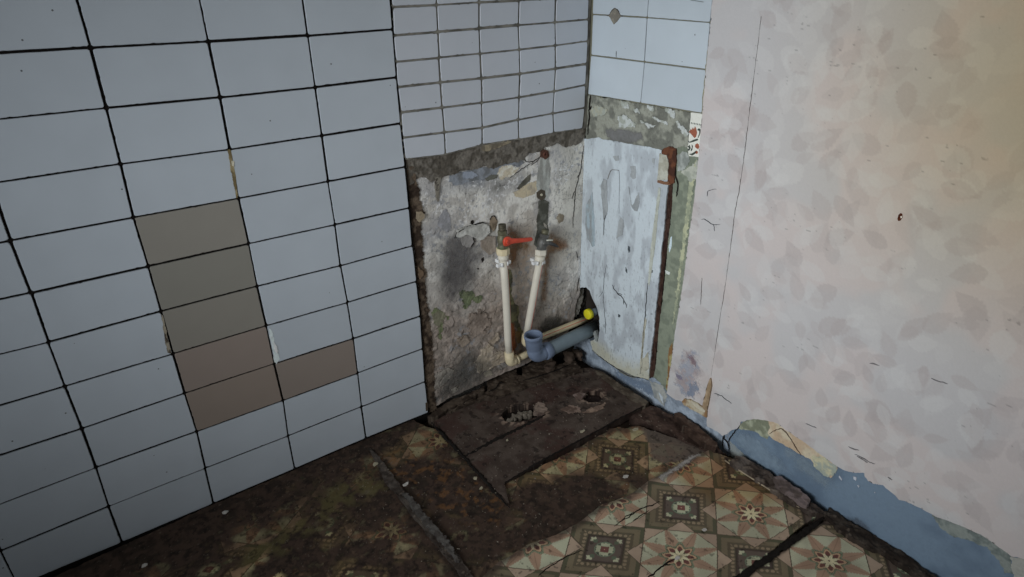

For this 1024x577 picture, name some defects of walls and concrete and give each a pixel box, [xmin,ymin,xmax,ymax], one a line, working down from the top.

damp [443,237,471,296]
crack [572,95,591,217]
corrosion [650,146,678,378]
peeling [406,95,1024,577]